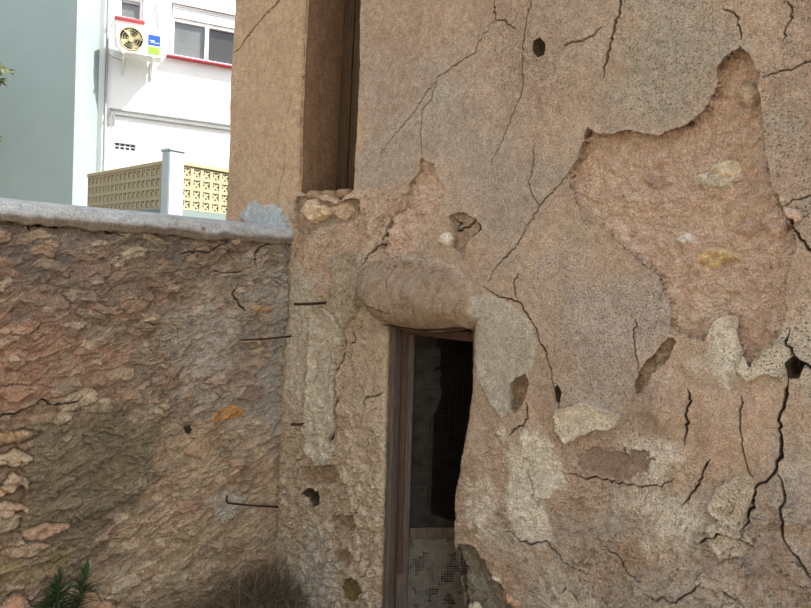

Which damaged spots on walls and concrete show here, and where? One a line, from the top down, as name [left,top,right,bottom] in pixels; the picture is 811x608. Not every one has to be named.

crack [562,0,623,79]
spalling [293,195,363,238]
spalling [437,212,483,254]
spalling [566,46,803,395]
crack [783,194,811,253]
crack [482,143,576,414]
flaking render [299,308,345,487]
flaking render [552,401,621,445]
crack [683,388,693,446]
crack [560,459,711,508]
crack [696,378,811,580]
spalling [456,543,521,608]